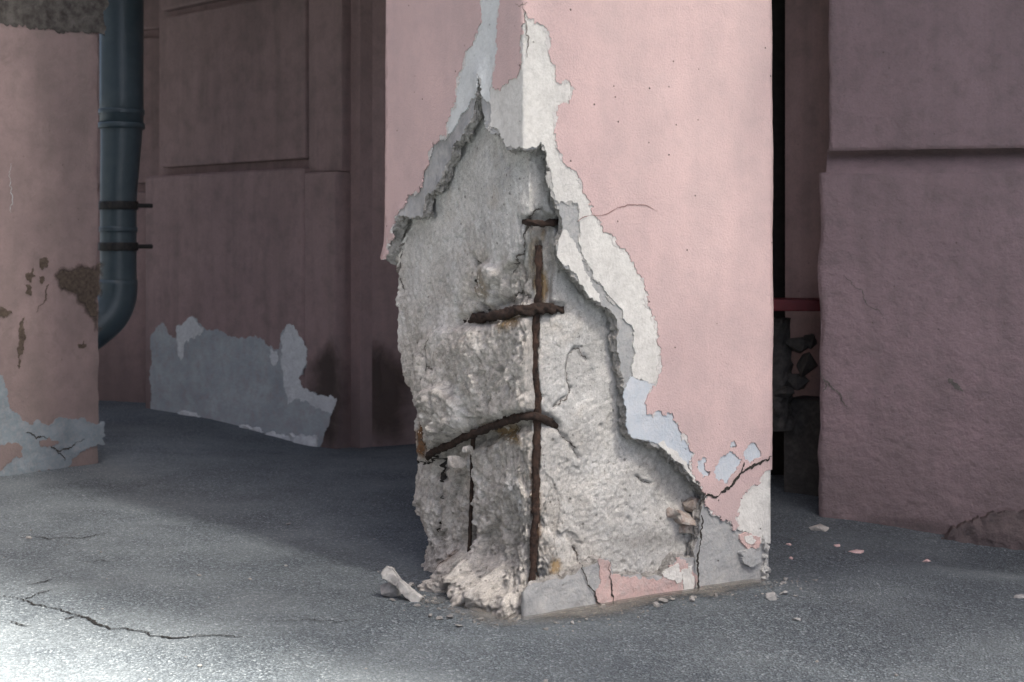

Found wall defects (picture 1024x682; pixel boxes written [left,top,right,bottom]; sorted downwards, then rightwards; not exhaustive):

spalling [395,0,760,621]
peeling [0,375,105,476]
crack [26,432,84,461]
peeling [149,316,337,447]
crack [696,455,773,589]
peeling [731,470,771,580]